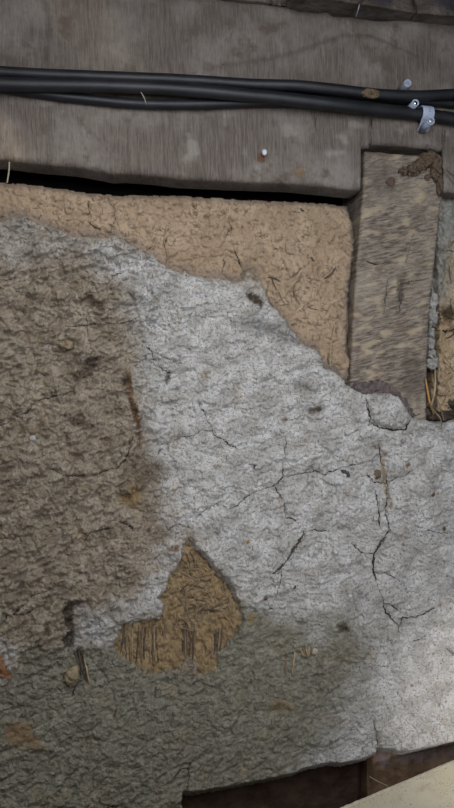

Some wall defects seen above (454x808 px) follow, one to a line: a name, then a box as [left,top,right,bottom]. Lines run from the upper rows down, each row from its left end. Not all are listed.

spalling [0,183,418,418]
spalling [426,198,454,412]
crack [156,404,243,457]
crack [366,400,411,431]
spalling [114,540,242,680]
crack [151,438,435,641]